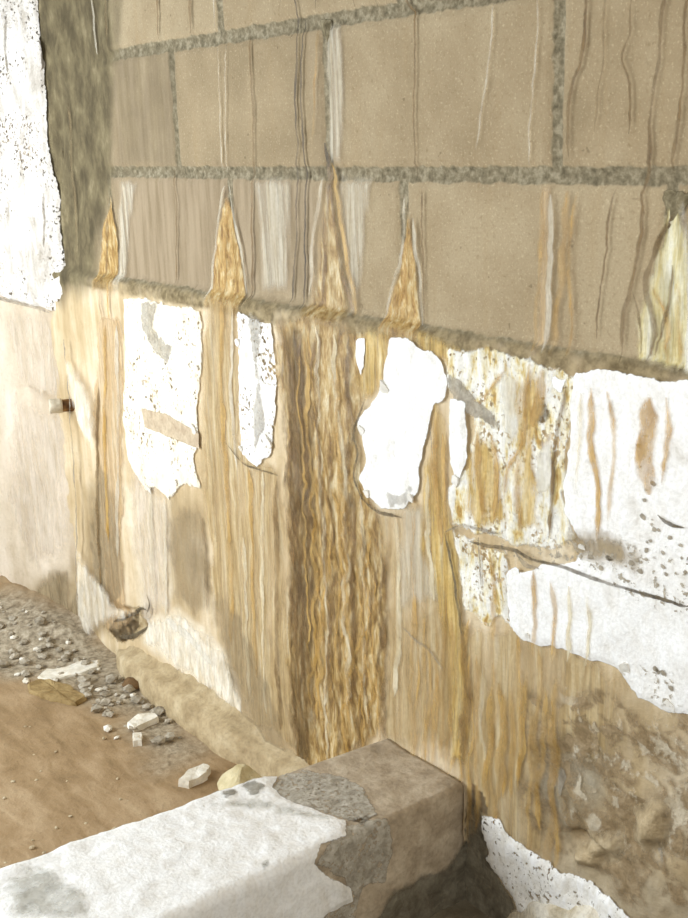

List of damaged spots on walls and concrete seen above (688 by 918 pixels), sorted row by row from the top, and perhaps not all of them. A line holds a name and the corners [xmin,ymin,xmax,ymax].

flaking render [0,0,66,312]
water stain [620,118,688,370]
corrosion [93,198,130,630]
peeling [123,298,202,499]
peeling [234,312,277,466]
peeling [355,338,365,374]
corrosion [205,144,615,856]
peeling [357,337,688,918]
crack [445,527,603,634]
crack [625,587,688,607]
crack [658,515,684,528]